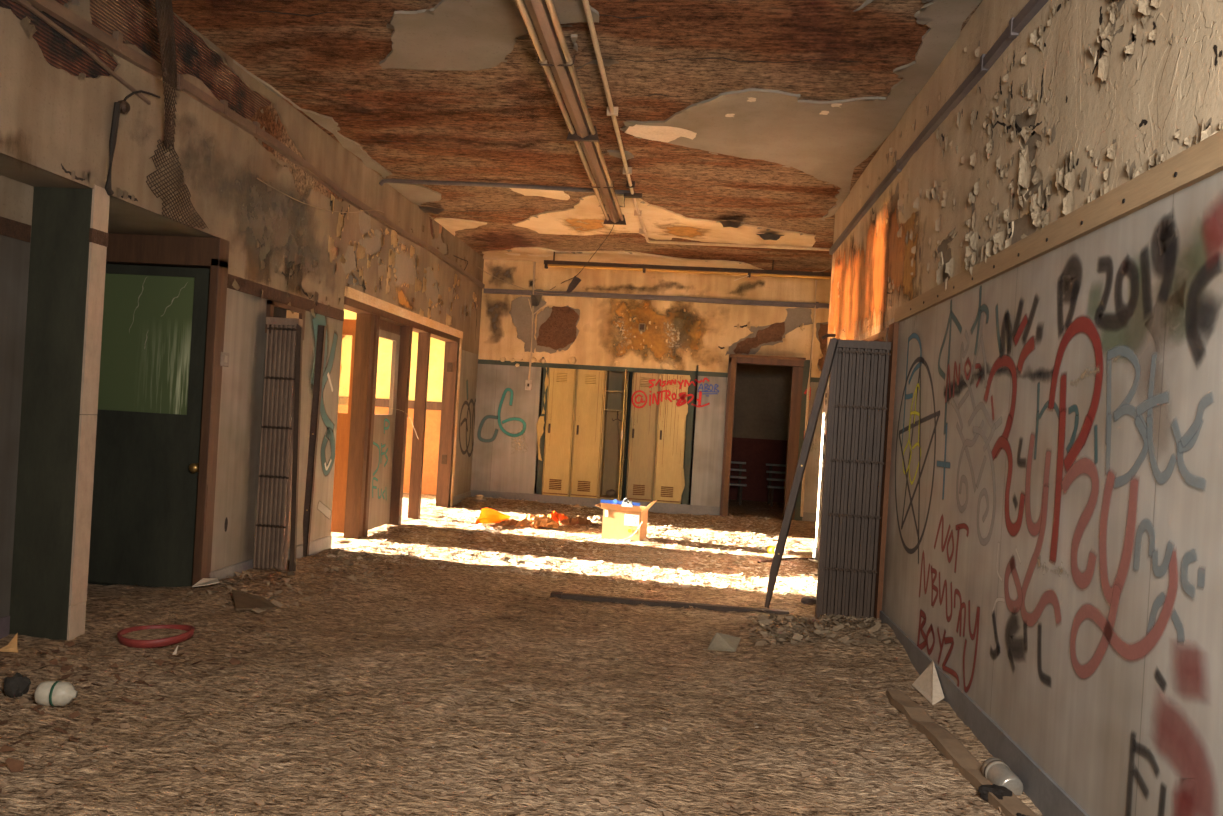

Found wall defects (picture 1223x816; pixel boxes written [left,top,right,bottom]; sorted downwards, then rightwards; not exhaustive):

spalling [0,0,161,81]
peeling [620,122,697,142]
peeling [880,70,1056,282]
peeling [333,210,476,326]
spalling [509,295,580,354]
spalling [725,307,828,372]